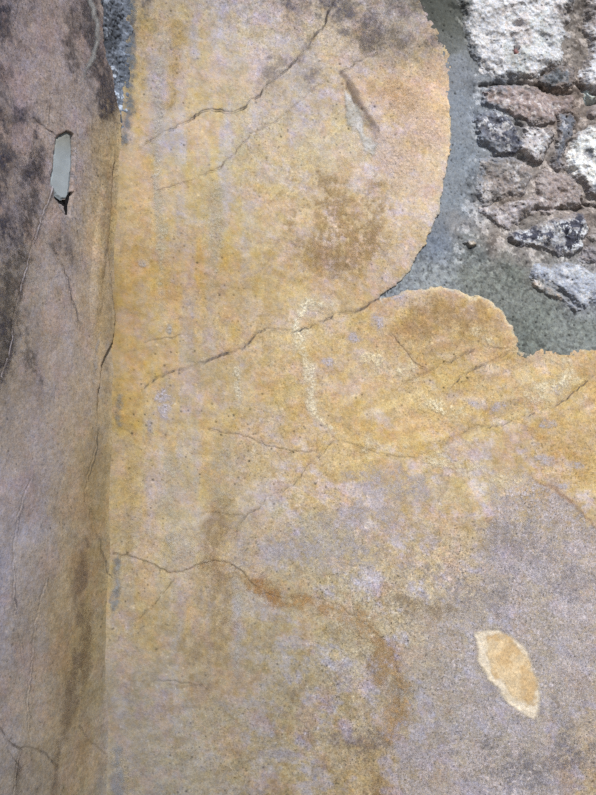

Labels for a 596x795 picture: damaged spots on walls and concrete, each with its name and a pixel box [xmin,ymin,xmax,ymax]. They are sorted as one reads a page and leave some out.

spalling [53,193,70,215]
crack [146,51,304,142]
flaking render [380,0,596,358]
peeling [399,477,596,795]